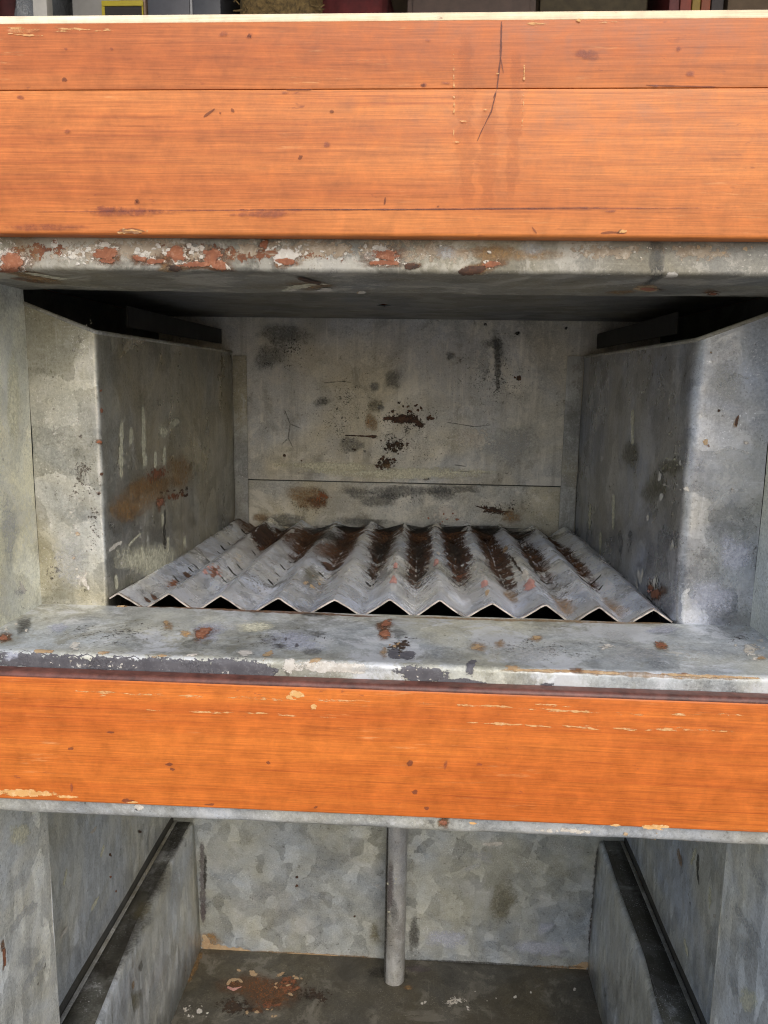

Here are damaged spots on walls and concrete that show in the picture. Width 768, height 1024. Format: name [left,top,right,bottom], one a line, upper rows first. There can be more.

crack [477,22,504,141]
peeling [4,228,548,266]
rust [237,362,616,620]
rust [168,563,222,587]
rust [378,619,392,657]
peeling [0,649,282,676]
peeling [0,789,77,798]
rust [216,969,333,1018]